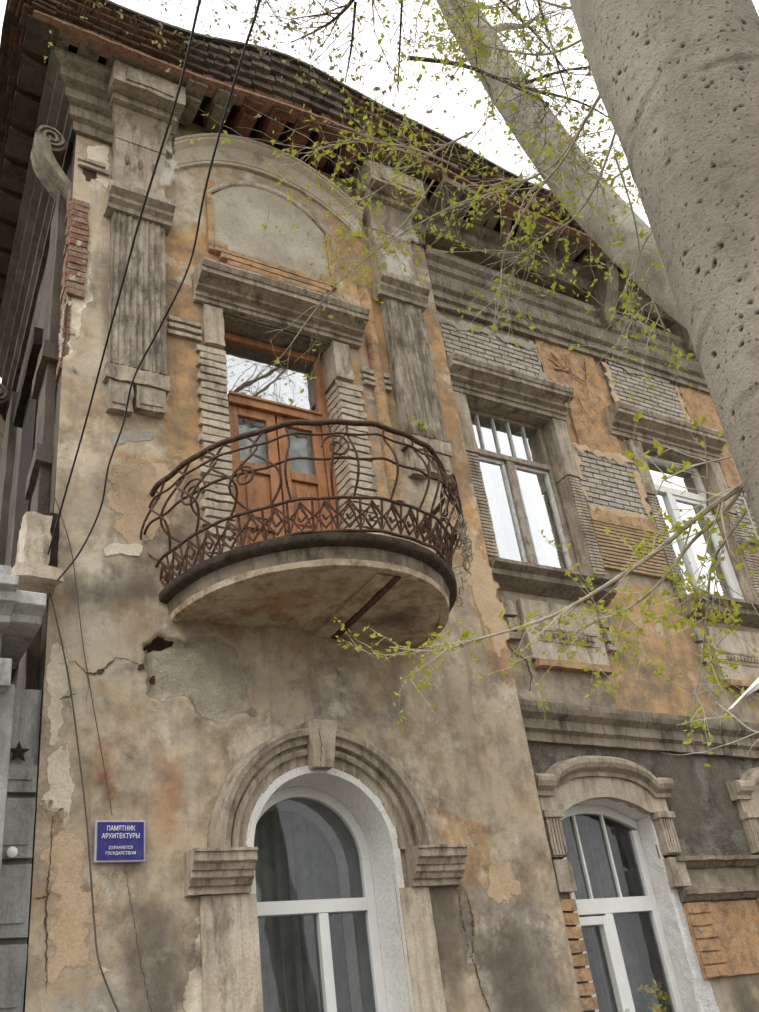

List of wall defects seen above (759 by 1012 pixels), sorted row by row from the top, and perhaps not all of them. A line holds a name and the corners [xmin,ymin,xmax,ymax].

spalling [55,188,93,382]
crack [59,657,140,708]
spalling [137,636,257,724]
peeling [40,639,108,984]
crack [456,887,490,1011]